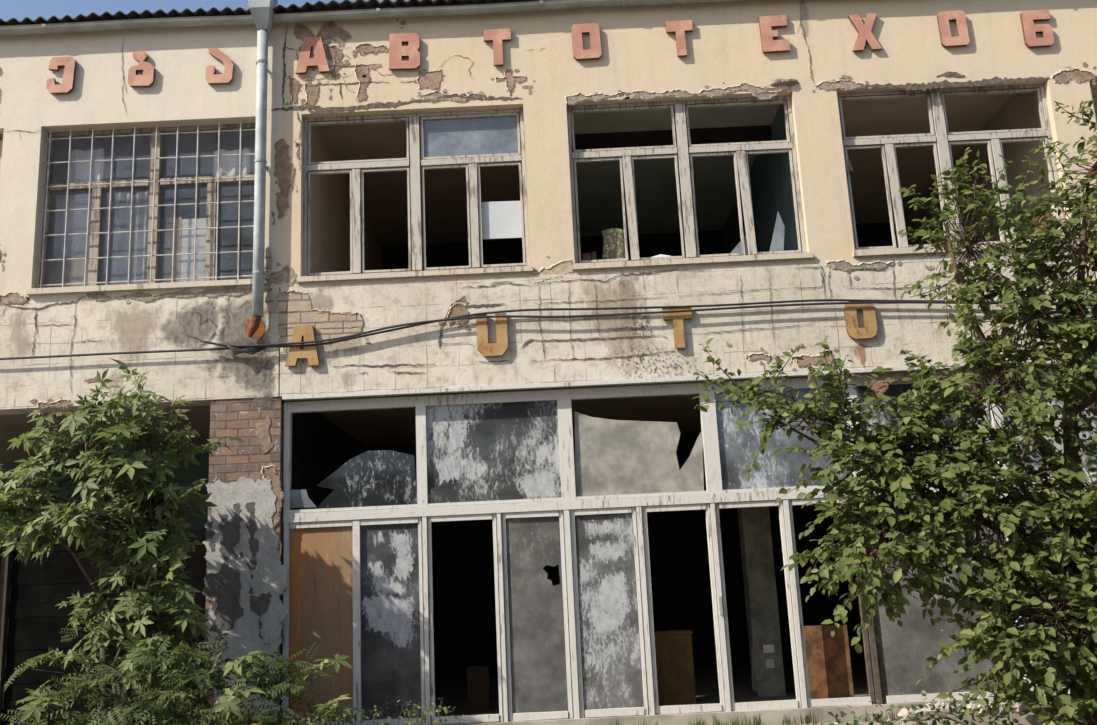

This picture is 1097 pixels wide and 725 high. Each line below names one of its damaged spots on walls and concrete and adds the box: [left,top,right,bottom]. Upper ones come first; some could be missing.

flaking render [285,21,389,108]
flaking render [410,69,486,103]
flaking render [564,82,792,105]
flaking render [1050,62,1097,85]
peeling [266,138,302,226]
crack [0,294,92,391]
crack [183,301,252,348]
flaking render [86,247,372,354]
corrosion [245,320,265,364]
crack [279,291,361,329]
crack [333,266,947,375]
peeling [202,416,289,714]